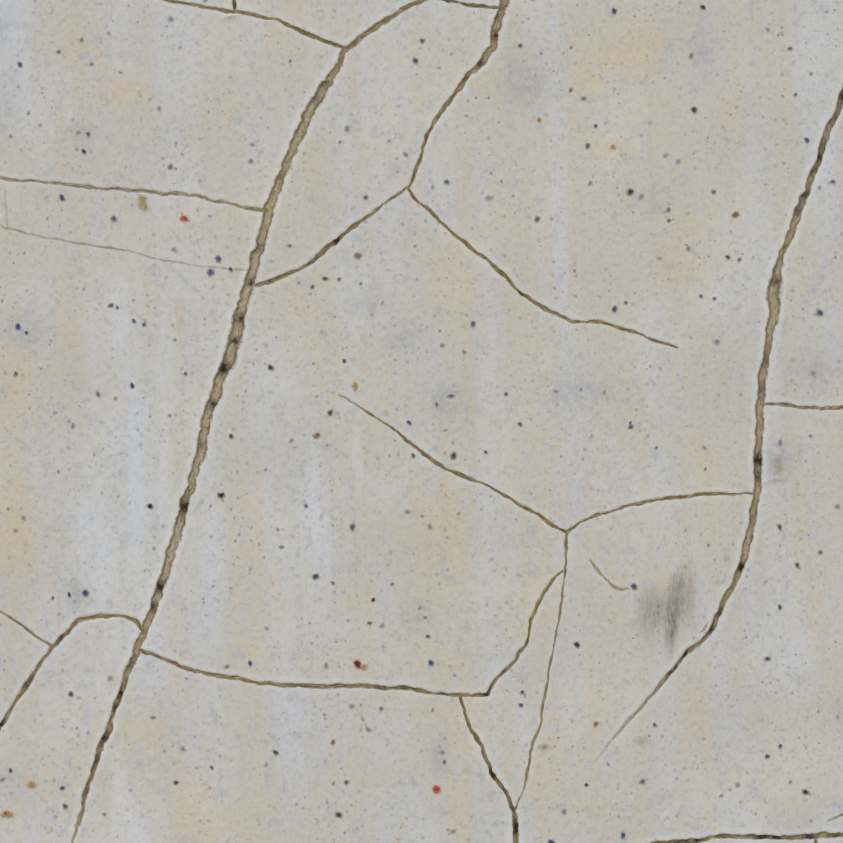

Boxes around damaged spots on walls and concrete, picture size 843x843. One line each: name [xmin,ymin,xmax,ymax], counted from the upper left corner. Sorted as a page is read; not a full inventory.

crack [0,0,564,843]
crack [255,0,678,348]
crack [356,89,843,735]
crack [651,813,843,843]